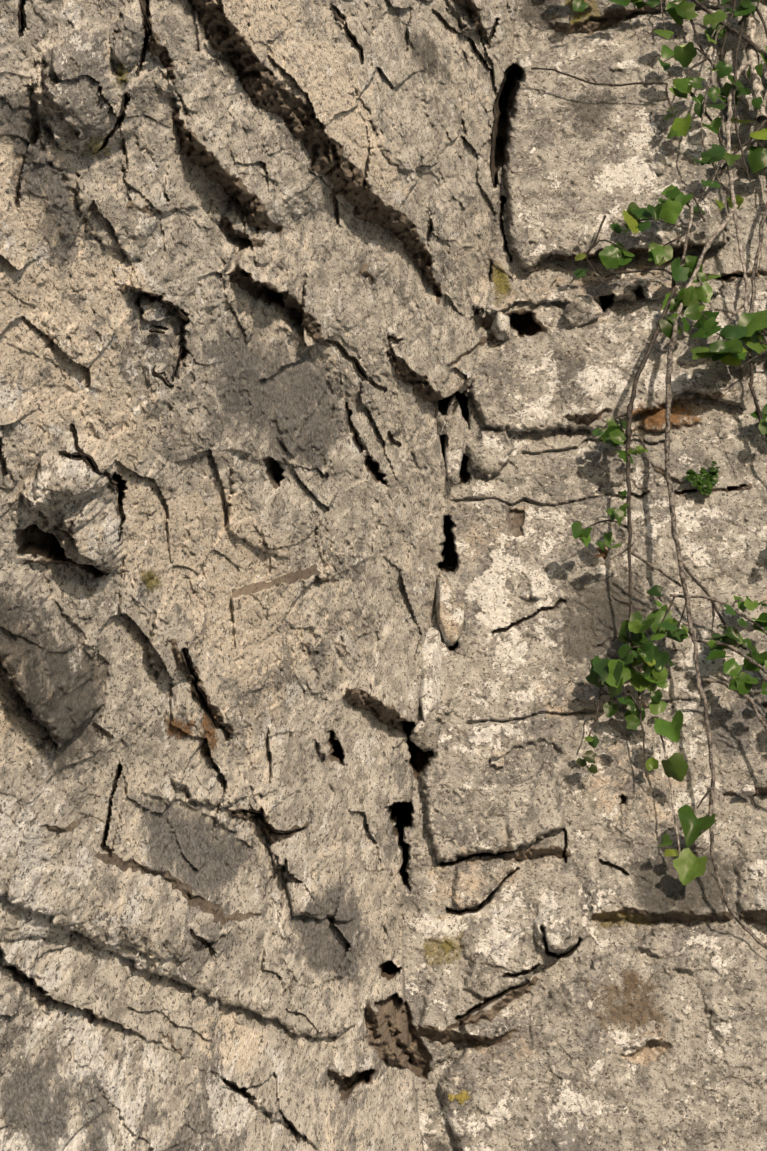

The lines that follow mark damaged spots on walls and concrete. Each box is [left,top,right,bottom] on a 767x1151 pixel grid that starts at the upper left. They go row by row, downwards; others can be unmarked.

crack [432,11,520,261]
crack [0,439,8,476]
crack [59,424,125,542]
spalling [15,496,122,576]
crack [440,851,518,915]
spalling [374,993,432,1079]